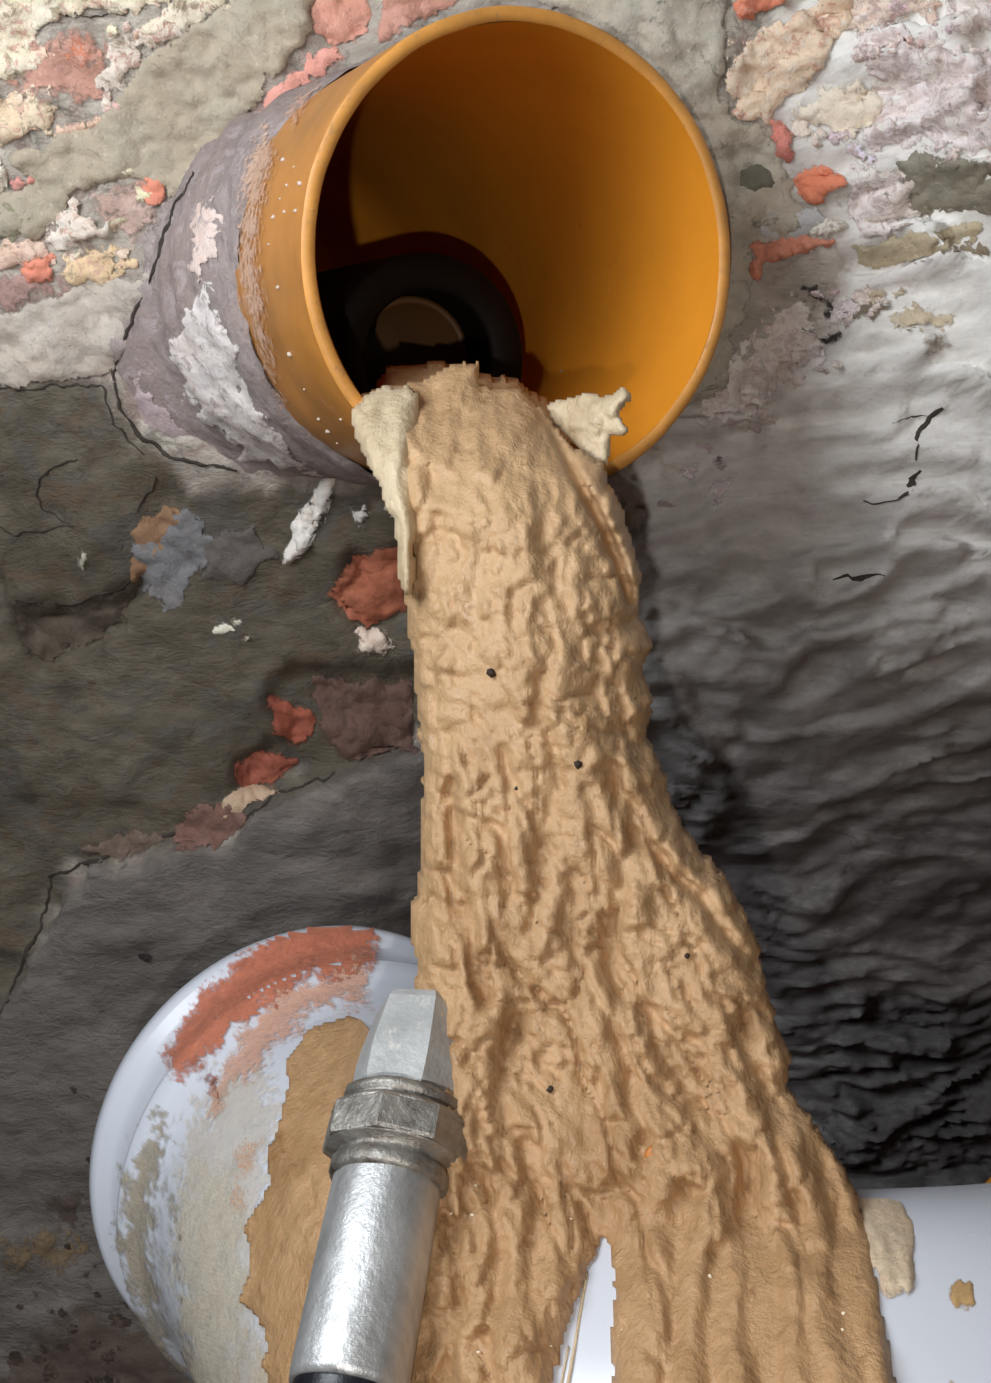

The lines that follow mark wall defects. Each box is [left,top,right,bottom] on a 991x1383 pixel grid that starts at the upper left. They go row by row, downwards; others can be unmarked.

peeling [0,0,231,193]
peeling [0,168,166,286]
peeling [678,0,991,506]
crack [863,407,944,505]
spalling [17,505,280,662]
flaking render [327,547,407,629]
flaking render [234,674,419,787]
flaking render [80,802,250,862]
crack [161,831,176,839]
crack [245,772,334,820]
crack [0,855,110,1014]